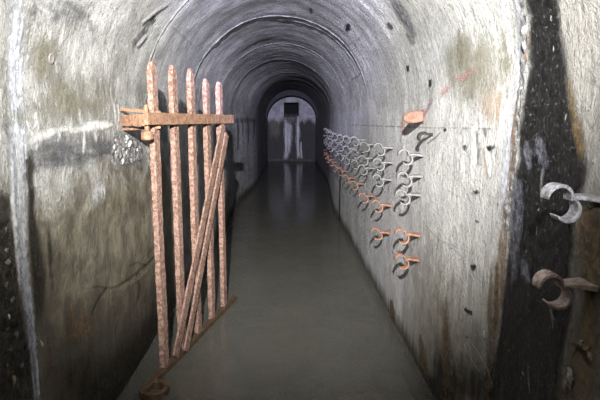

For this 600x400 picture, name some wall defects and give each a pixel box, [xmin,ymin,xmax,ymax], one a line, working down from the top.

damp [8,0,23,112]
damp [368,24,491,107]
damp [9,86,120,399]
spalling [111,133,143,165]
damp [419,0,600,400]
corrosion [486,203,507,395]
damp [92,311,158,400]